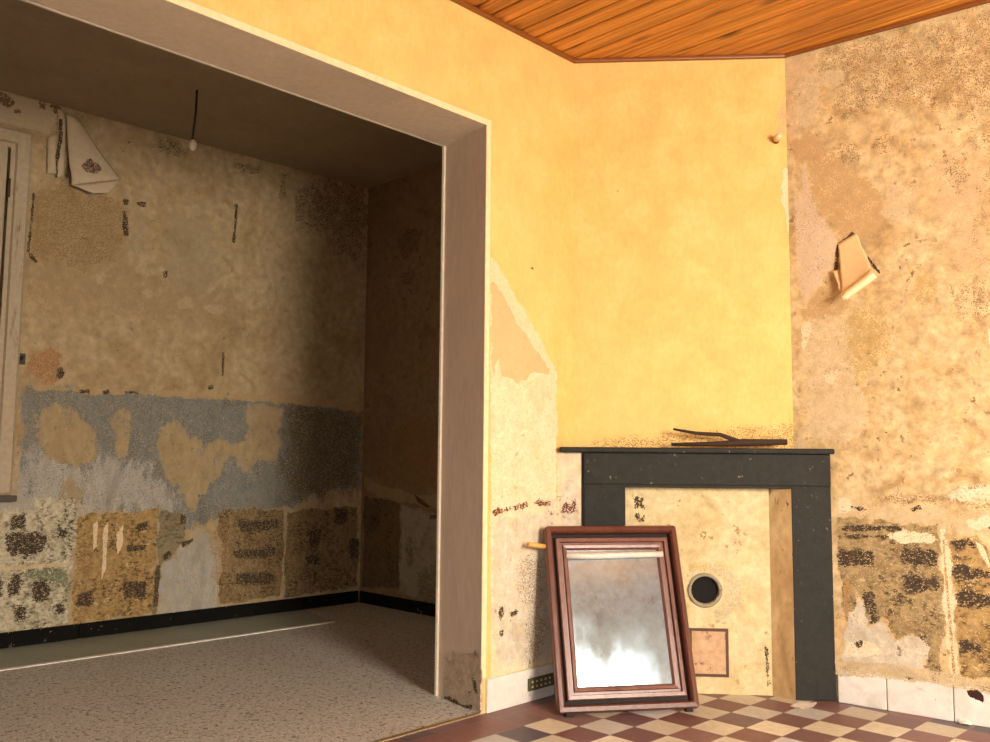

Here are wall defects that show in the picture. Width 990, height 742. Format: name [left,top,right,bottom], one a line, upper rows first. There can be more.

peeling [47,109,121,193]
spalling [122,198,146,265]
spalling [158,523,223,614]
spalling [398,504,437,604]
spalling [835,497,990,544]
spalling [835,601,990,703]